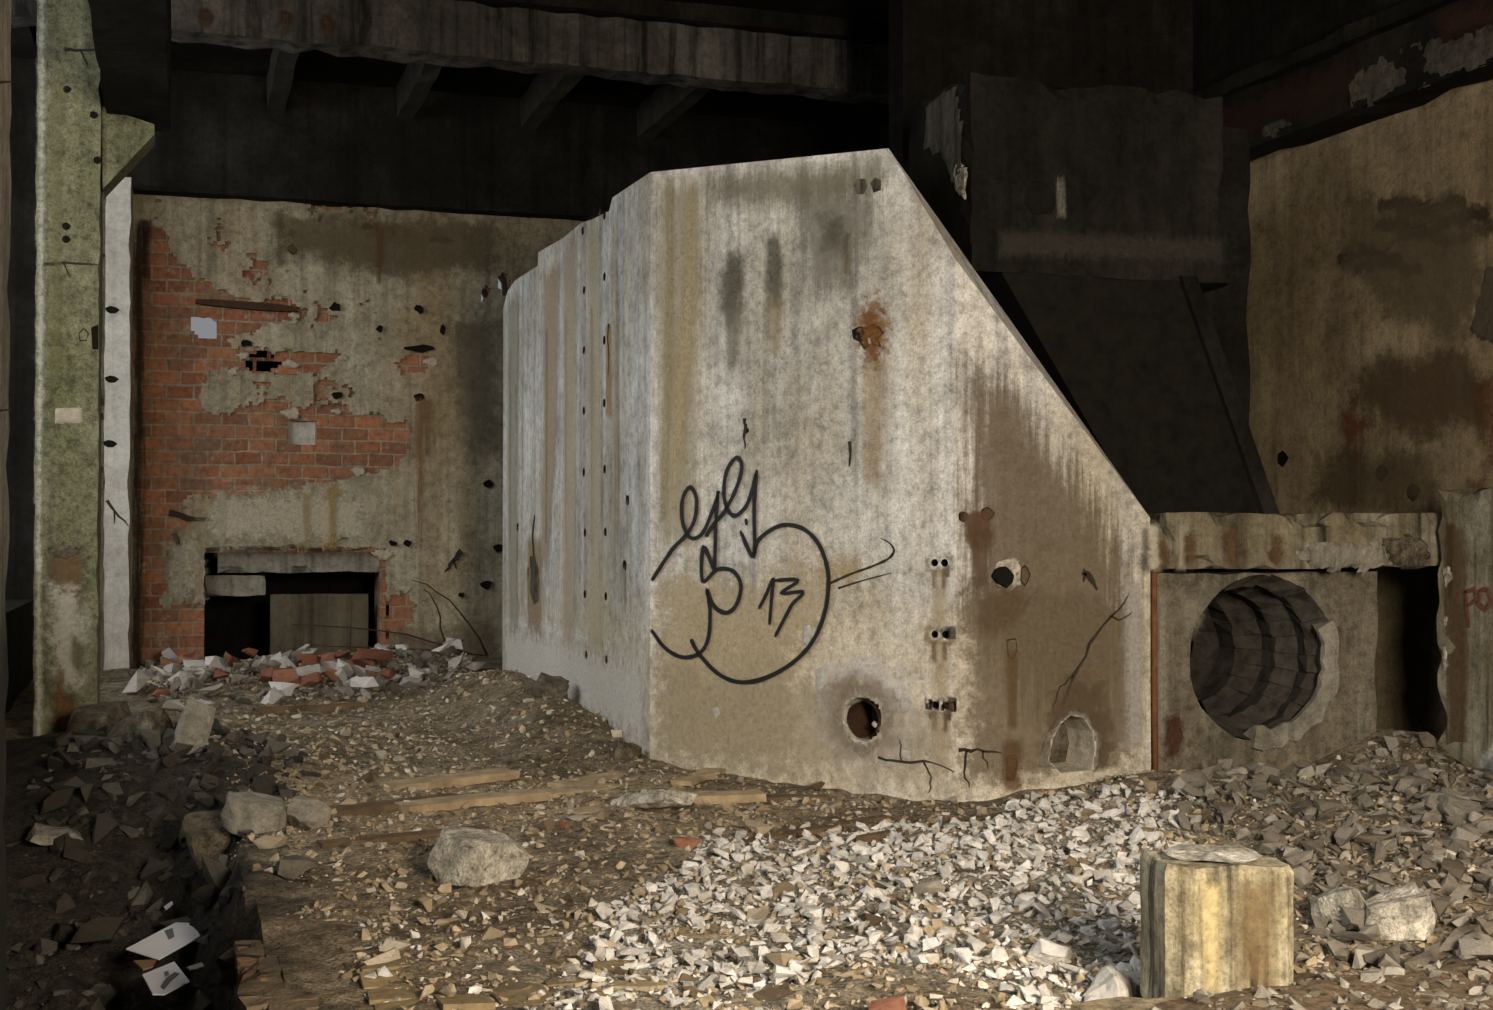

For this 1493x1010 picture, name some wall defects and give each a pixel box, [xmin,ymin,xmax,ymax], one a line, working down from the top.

peeling [1348,24,1493,107]
peeling [394,324,446,375]
corrosion [855,292,889,367]
peeling [78,217,410,666]
peeling [371,540,417,646]